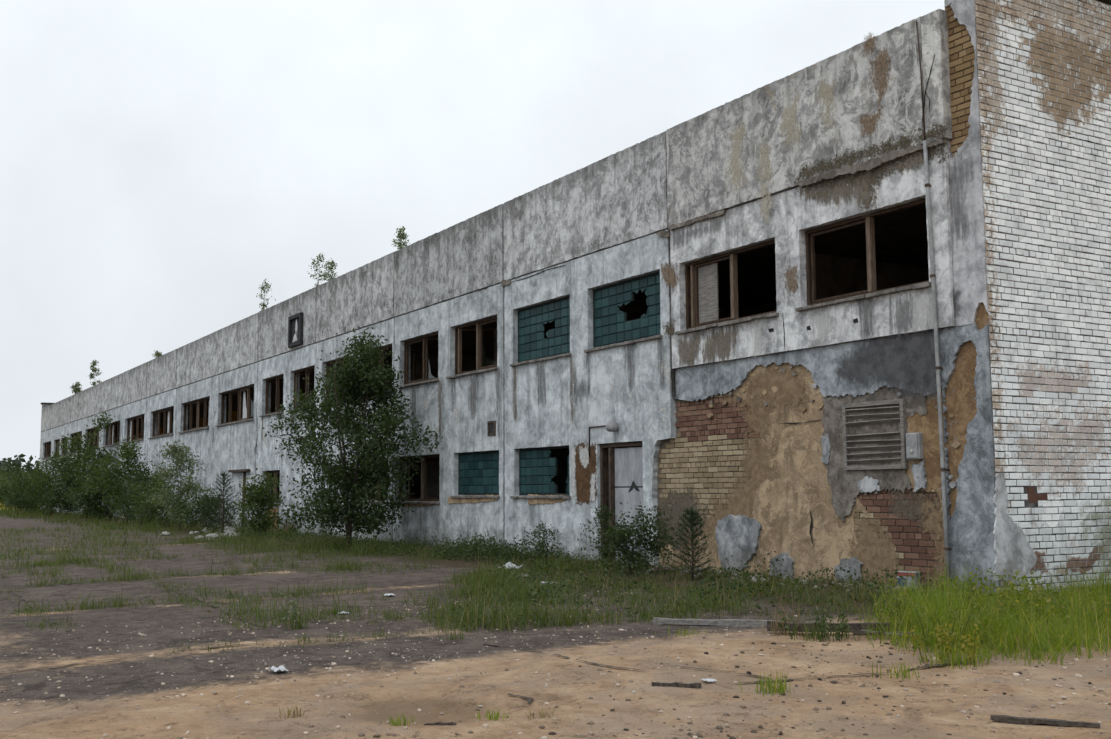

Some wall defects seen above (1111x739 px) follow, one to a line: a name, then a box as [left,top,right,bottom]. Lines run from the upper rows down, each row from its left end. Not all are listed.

damp [725,125,774,221]
spalling [794,0,1111,216]
flaking render [656,303,992,589]
peeling [1017,363,1111,503]